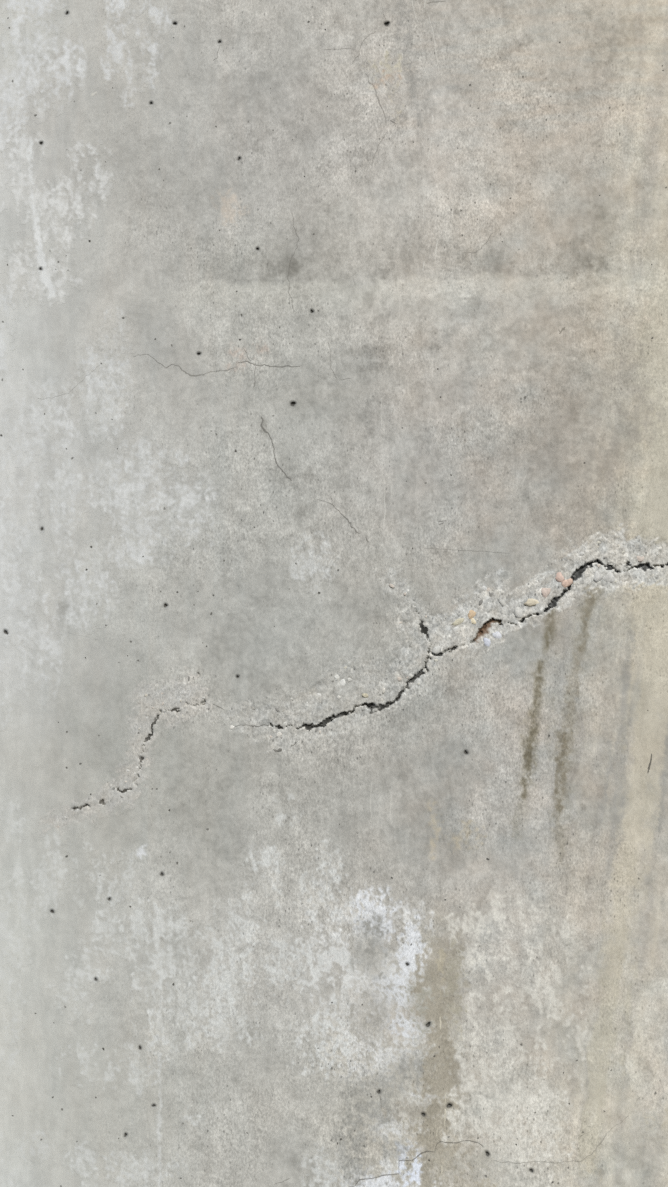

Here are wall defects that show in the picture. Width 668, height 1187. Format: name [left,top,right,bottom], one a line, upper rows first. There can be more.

crack [486,560,668,625]
crack [139,621,457,762]
crack [73,788,132,811]
damp [0,590,668,1187]